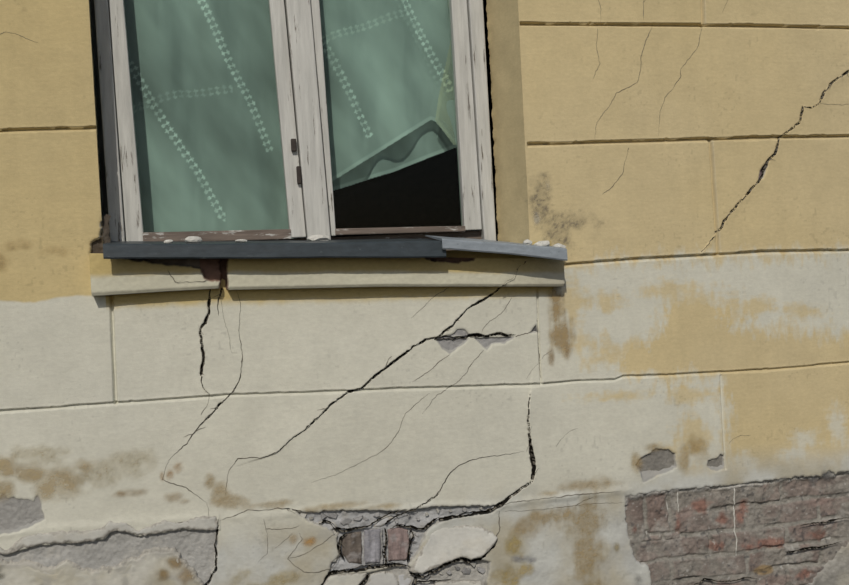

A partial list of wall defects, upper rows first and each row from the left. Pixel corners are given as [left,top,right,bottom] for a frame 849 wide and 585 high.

crack [701,71,849,252]
flaking render [436,329,511,350]
water stain [551,289,569,352]
water stain [0,459,74,495]
crack [163,261,622,585]
flaking render [637,449,674,472]
flaking render [707,455,722,467]
flaking render [0,494,218,584]
flaking render [300,505,497,585]
flaking render [625,471,849,585]